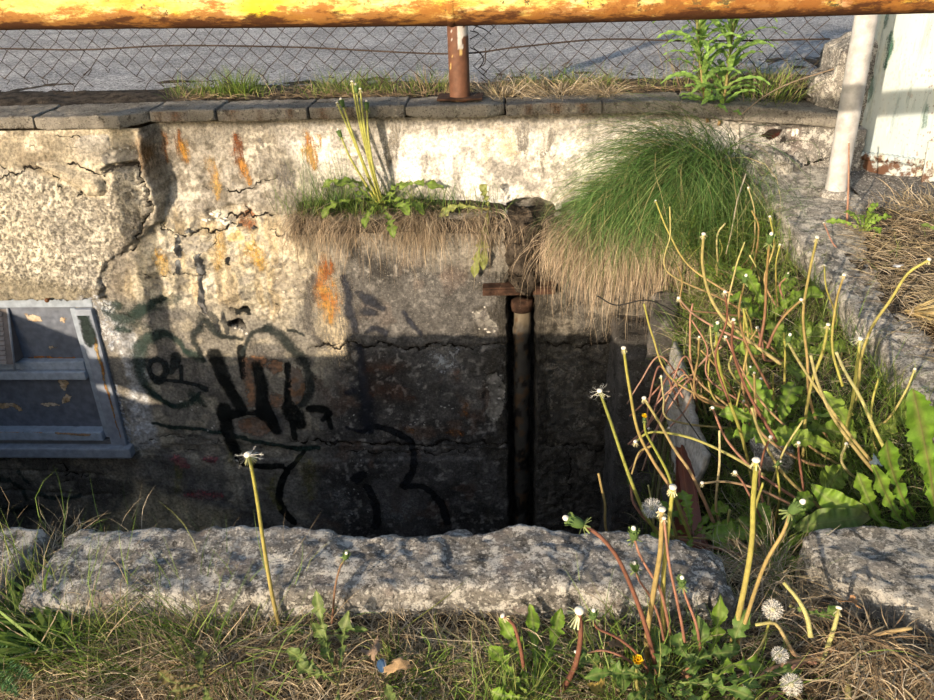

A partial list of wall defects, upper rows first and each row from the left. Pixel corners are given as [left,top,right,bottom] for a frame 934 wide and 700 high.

spalling [101,146,141,175]
corrosion [162,129,189,163]
corrosion [232,134,252,186]
crack [121,162,296,278]
crack [310,341,498,351]
crack [551,341,609,349]
crack [290,438,502,456]